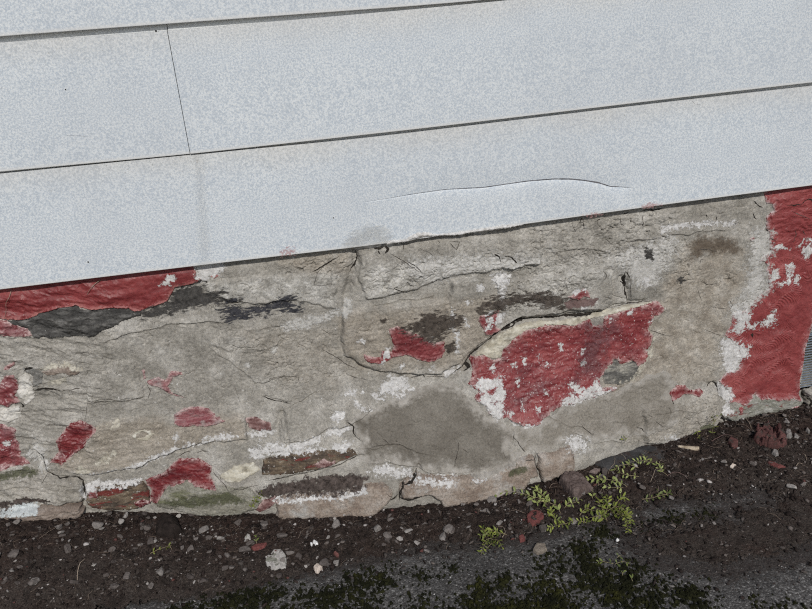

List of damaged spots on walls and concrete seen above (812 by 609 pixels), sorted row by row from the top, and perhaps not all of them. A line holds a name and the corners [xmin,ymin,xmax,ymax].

peeling [0,266,218,338]
water stain [140,262,353,332]
peeling [364,326,445,364]
crack [411,271,652,378]
peeling [468,301,664,427]
peeling [719,185,812,414]
peeling [0,362,80,471]
peeling [50,420,96,466]
peeling [131,429,155,441]
peeling [174,406,225,427]
peeling [134,458,260,507]